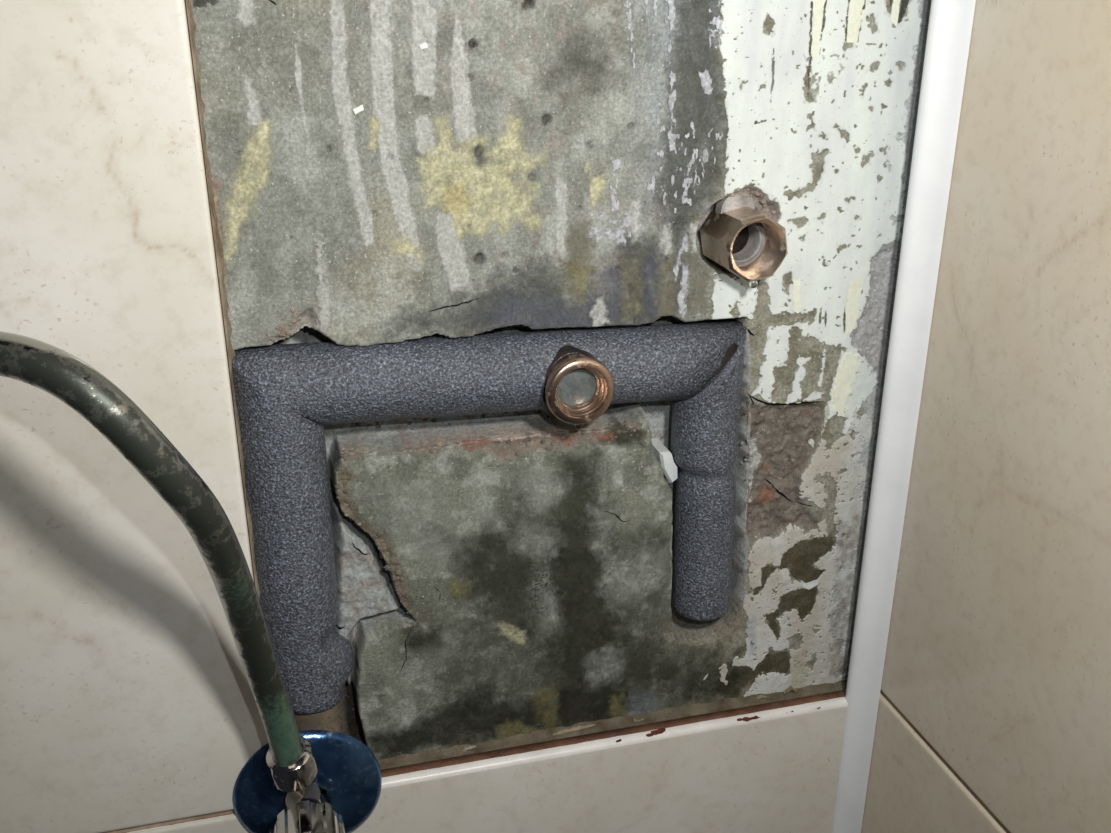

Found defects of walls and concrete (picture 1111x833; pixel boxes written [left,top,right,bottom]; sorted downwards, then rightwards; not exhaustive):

spalling [334,448,414,624]
spalling [399,414,639,458]
leakage [368,459,739,758]
crack [765,479,811,506]
peeling [703,0,923,697]